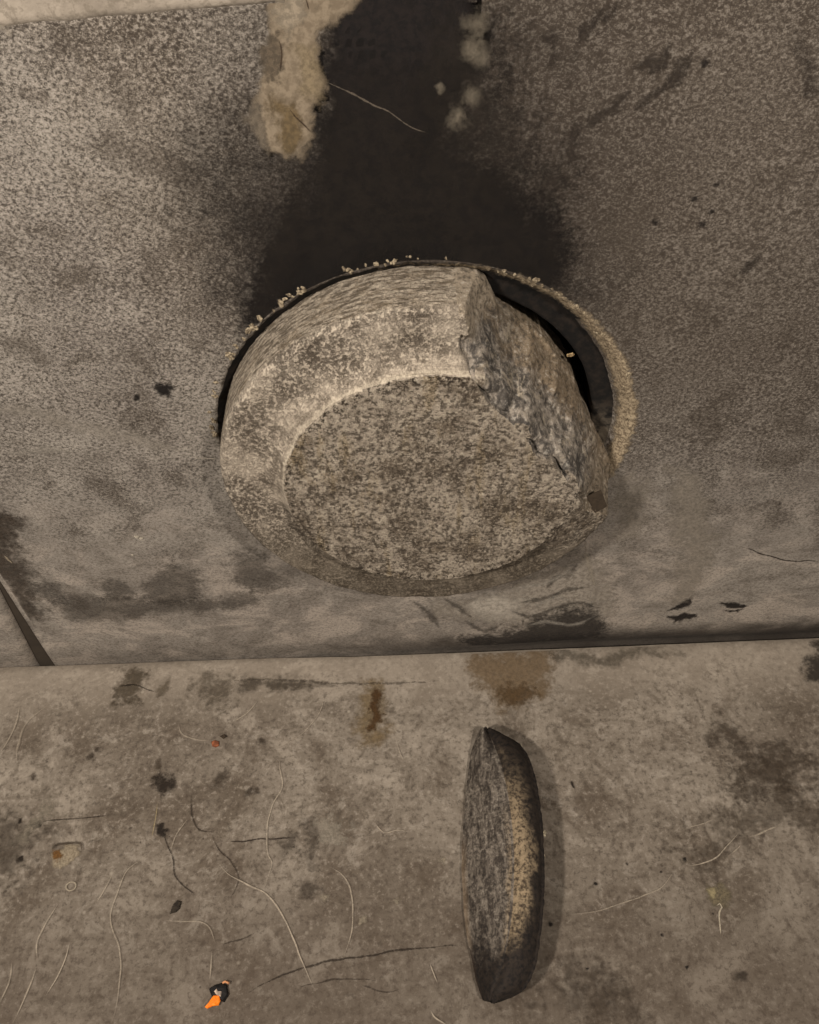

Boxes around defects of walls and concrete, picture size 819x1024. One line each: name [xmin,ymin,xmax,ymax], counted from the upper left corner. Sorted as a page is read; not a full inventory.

peeling [243,0,360,159]
water stain [637,46,692,105]
water stain [566,92,628,165]
water stain [202,0,563,319]
crack [743,547,819,563]
water stain [459,606,606,646]
corrosion [468,651,550,711]
corrosion [357,680,384,744]
crack [253,945,456,993]